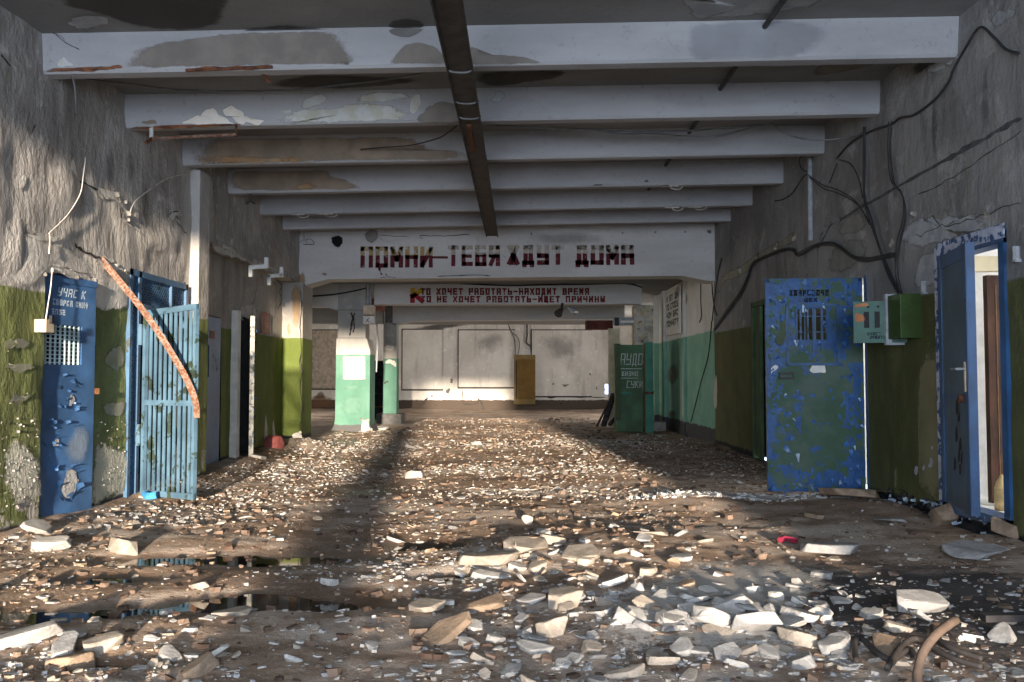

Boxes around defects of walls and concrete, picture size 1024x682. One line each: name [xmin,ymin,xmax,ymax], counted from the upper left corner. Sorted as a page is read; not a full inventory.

water stain [67,0,459,124]
peeling [182,105,264,125]
crack [909,130,1022,200]
peeling [888,209,990,288]
peeling [0,373,127,509]